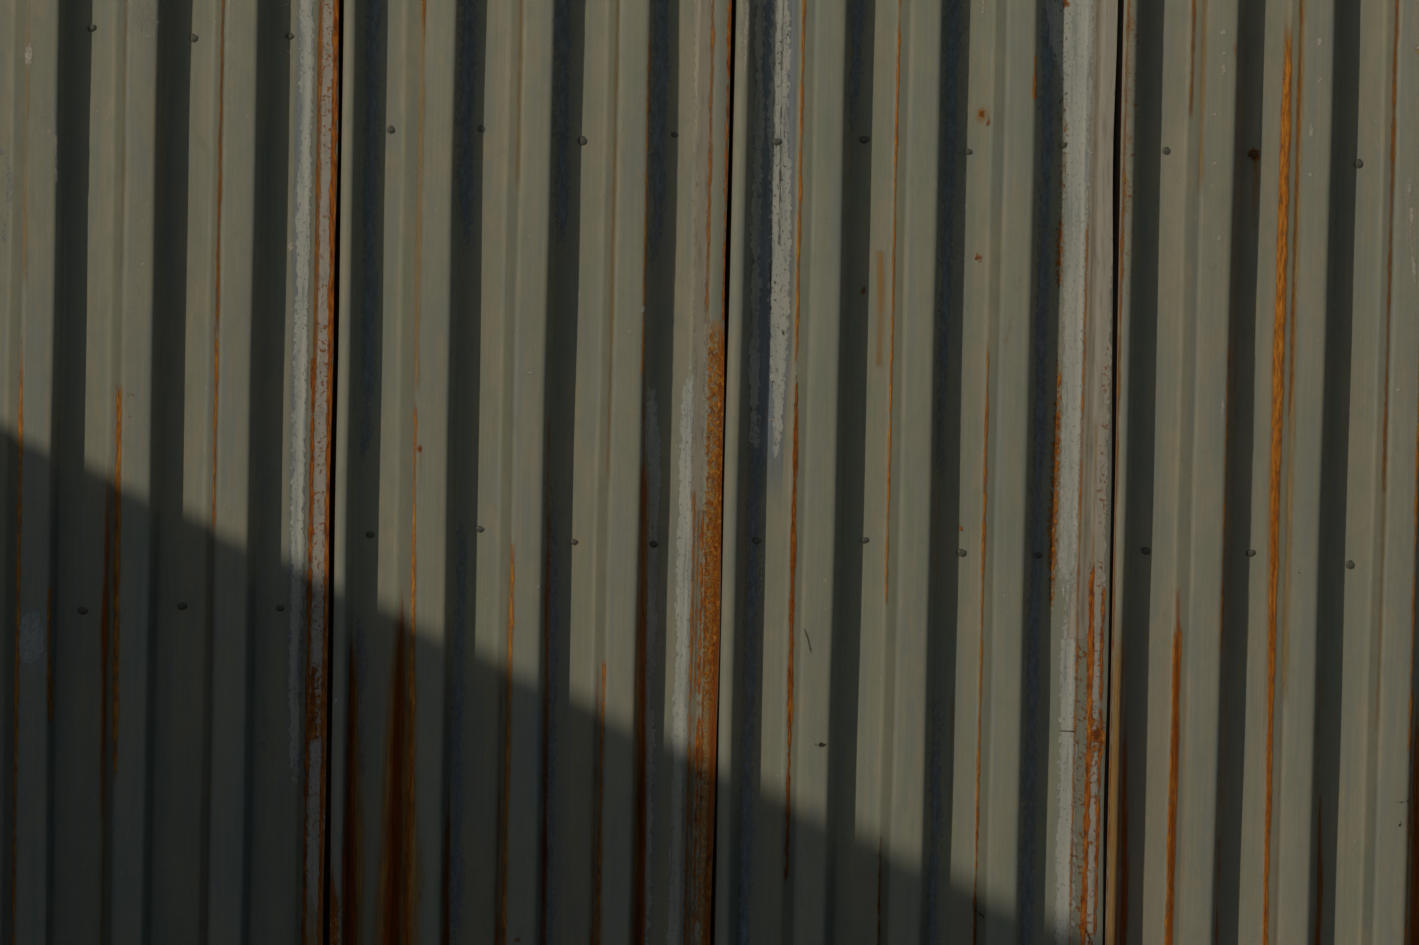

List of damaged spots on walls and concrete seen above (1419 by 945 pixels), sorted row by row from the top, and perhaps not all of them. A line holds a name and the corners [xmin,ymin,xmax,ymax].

rust [301,0,424,945]
rust [442,816,450,945]
rust [683,0,731,945]
peeling [738,0,796,945]
rust [1047,365,1062,613]
peeling [1019,0,1118,945]
rust [1060,461,1128,945]
rust [1102,0,1139,514]